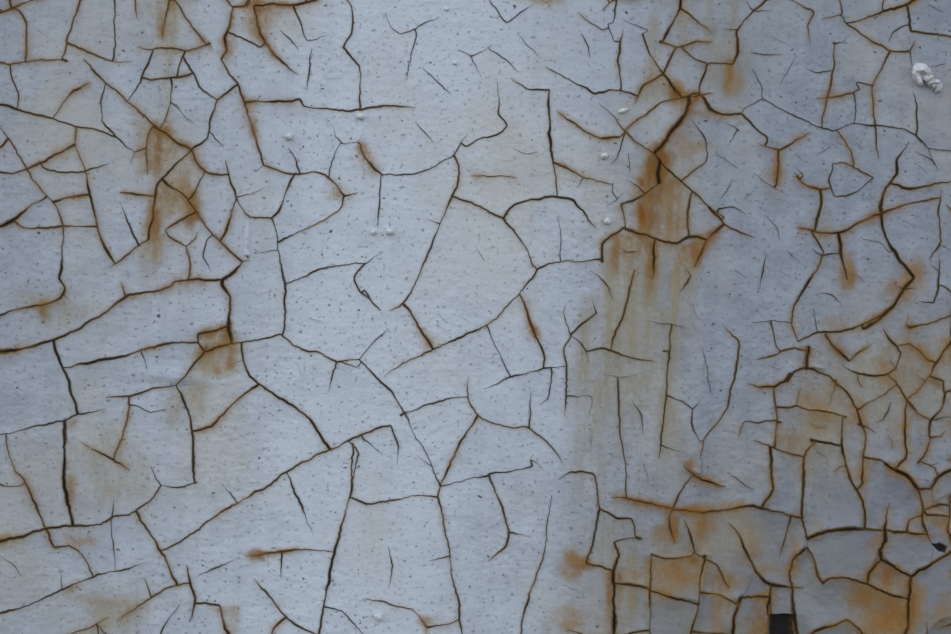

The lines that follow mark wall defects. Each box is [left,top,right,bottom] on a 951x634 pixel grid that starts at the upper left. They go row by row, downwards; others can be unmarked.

crack [0,0,951,490]
rust [637,144,680,280]
crack [0,420,242,634]
crack [611,376,847,558]
crack [561,464,951,634]
peeling [734,578,795,634]
peeling [808,531,951,634]
rust [856,564,922,634]